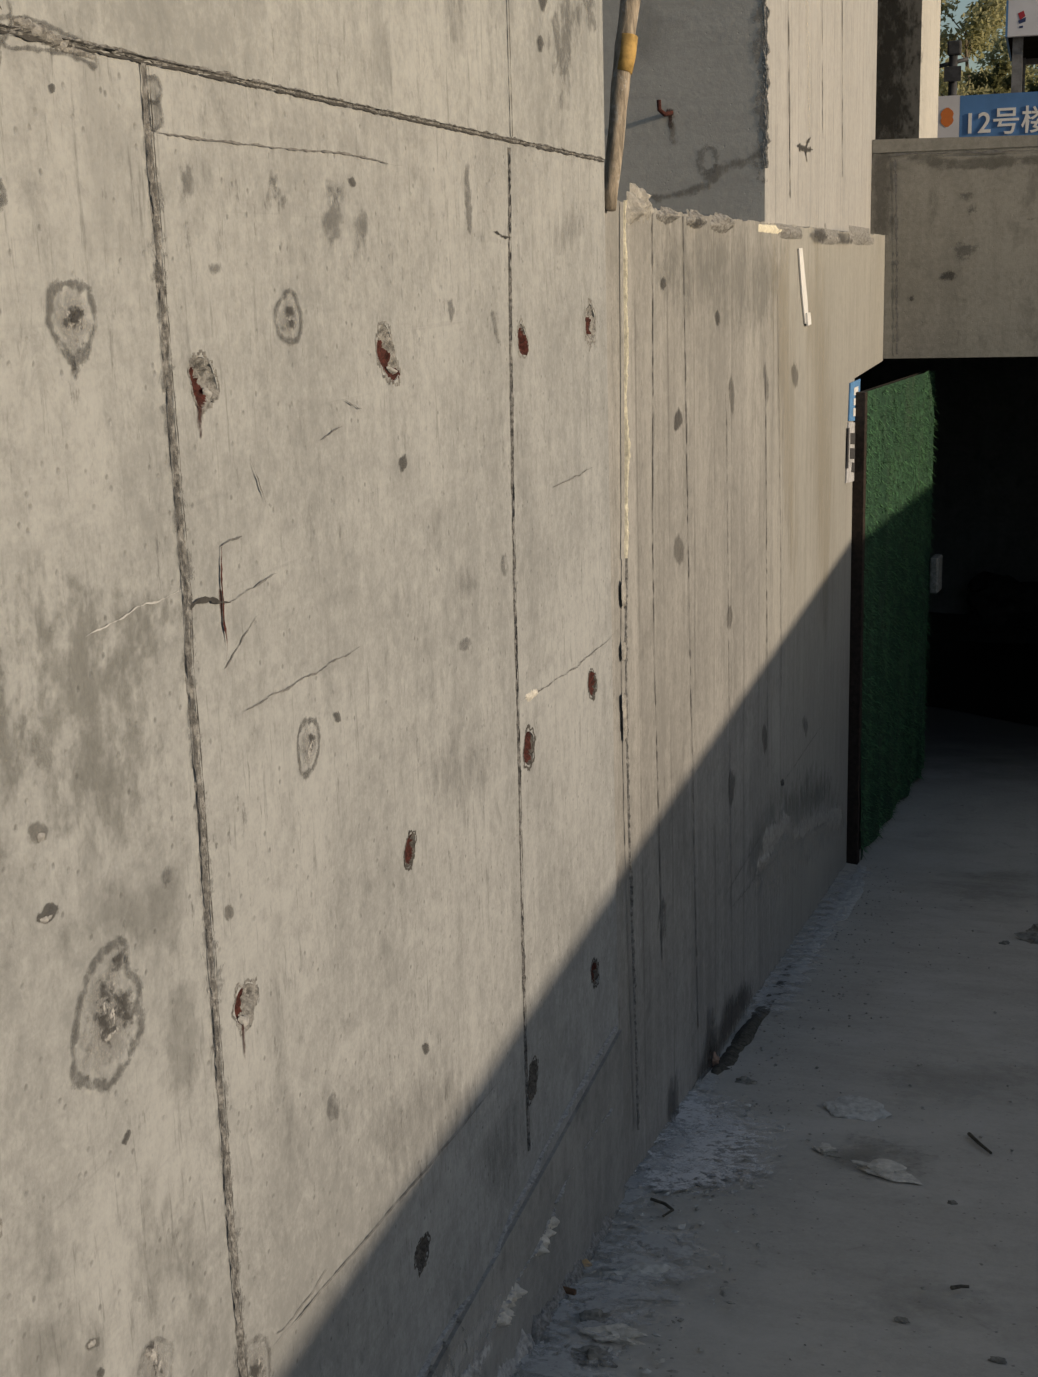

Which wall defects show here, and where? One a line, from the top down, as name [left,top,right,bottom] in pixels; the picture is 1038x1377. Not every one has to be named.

spalling [99,947,134,1045]
crack [0,29,615,1377]